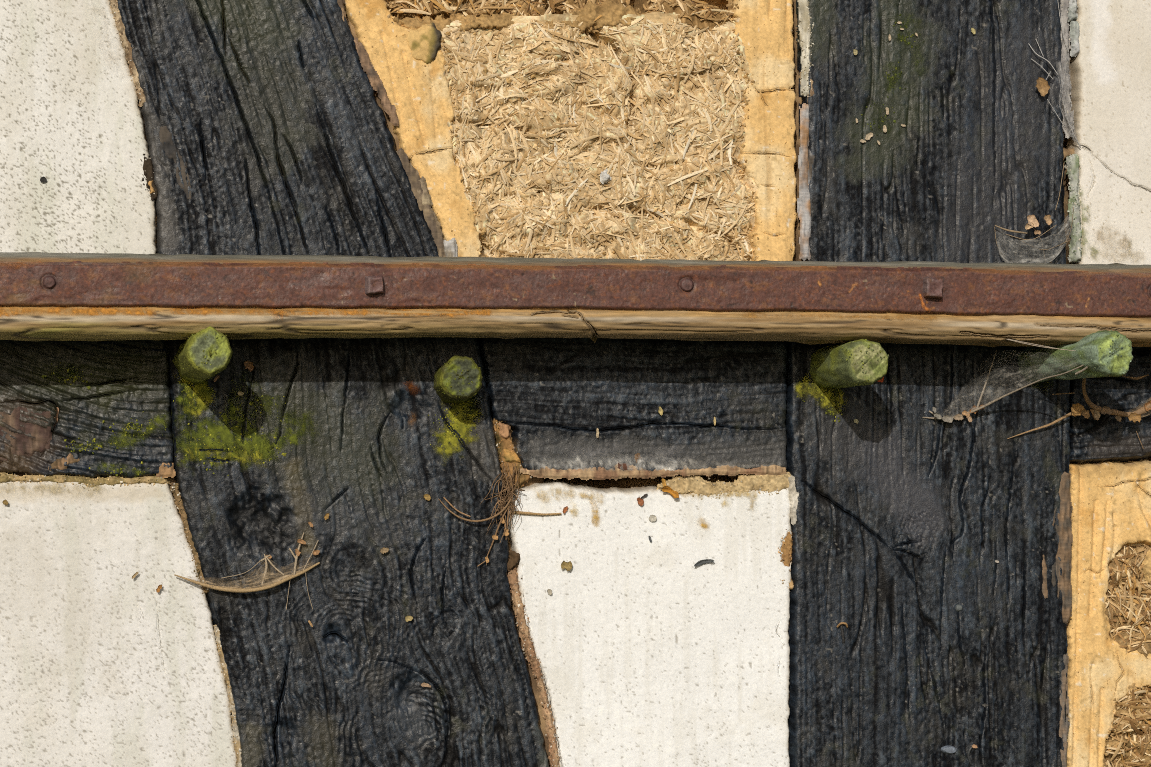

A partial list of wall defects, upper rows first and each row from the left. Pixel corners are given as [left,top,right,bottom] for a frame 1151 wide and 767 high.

peeling [354,38,399,126]
spalling [386,0,759,261]
crack [1066,144,1151,197]
water stain [186,377,314,463]
spalling [1105,543,1151,659]
spalling [1103,683,1151,767]